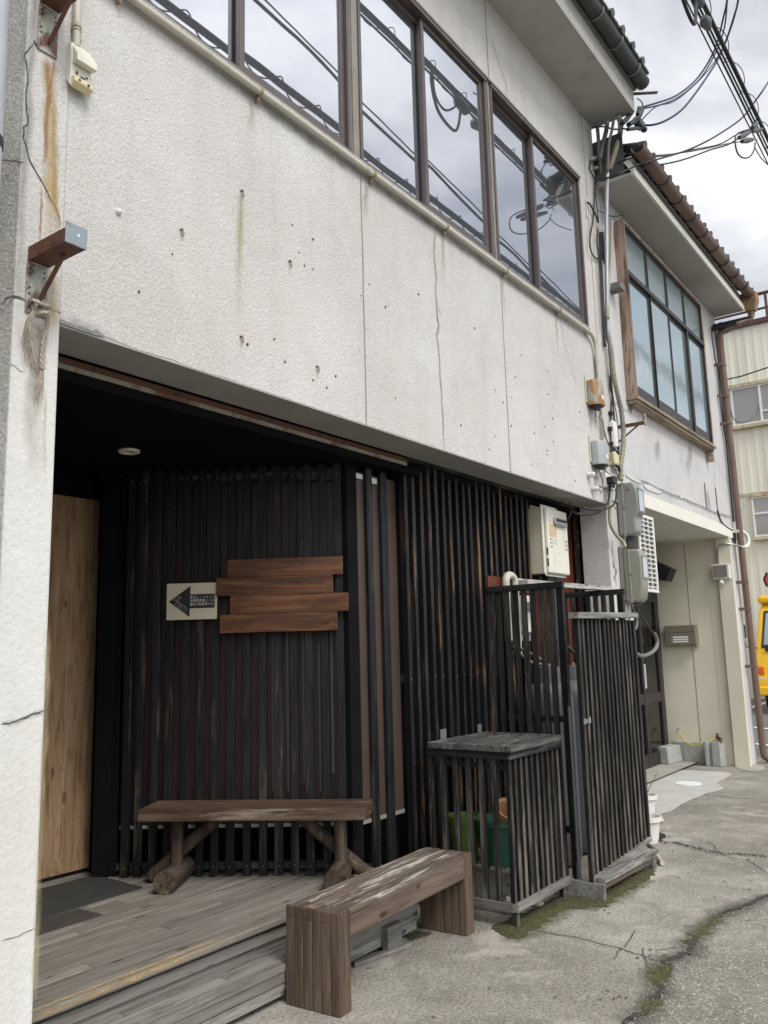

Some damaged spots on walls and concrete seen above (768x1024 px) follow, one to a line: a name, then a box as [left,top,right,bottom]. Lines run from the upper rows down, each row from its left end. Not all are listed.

corrosion [40,65,56,230]
crack [1,710,45,725]
crack [614,930,675,969]